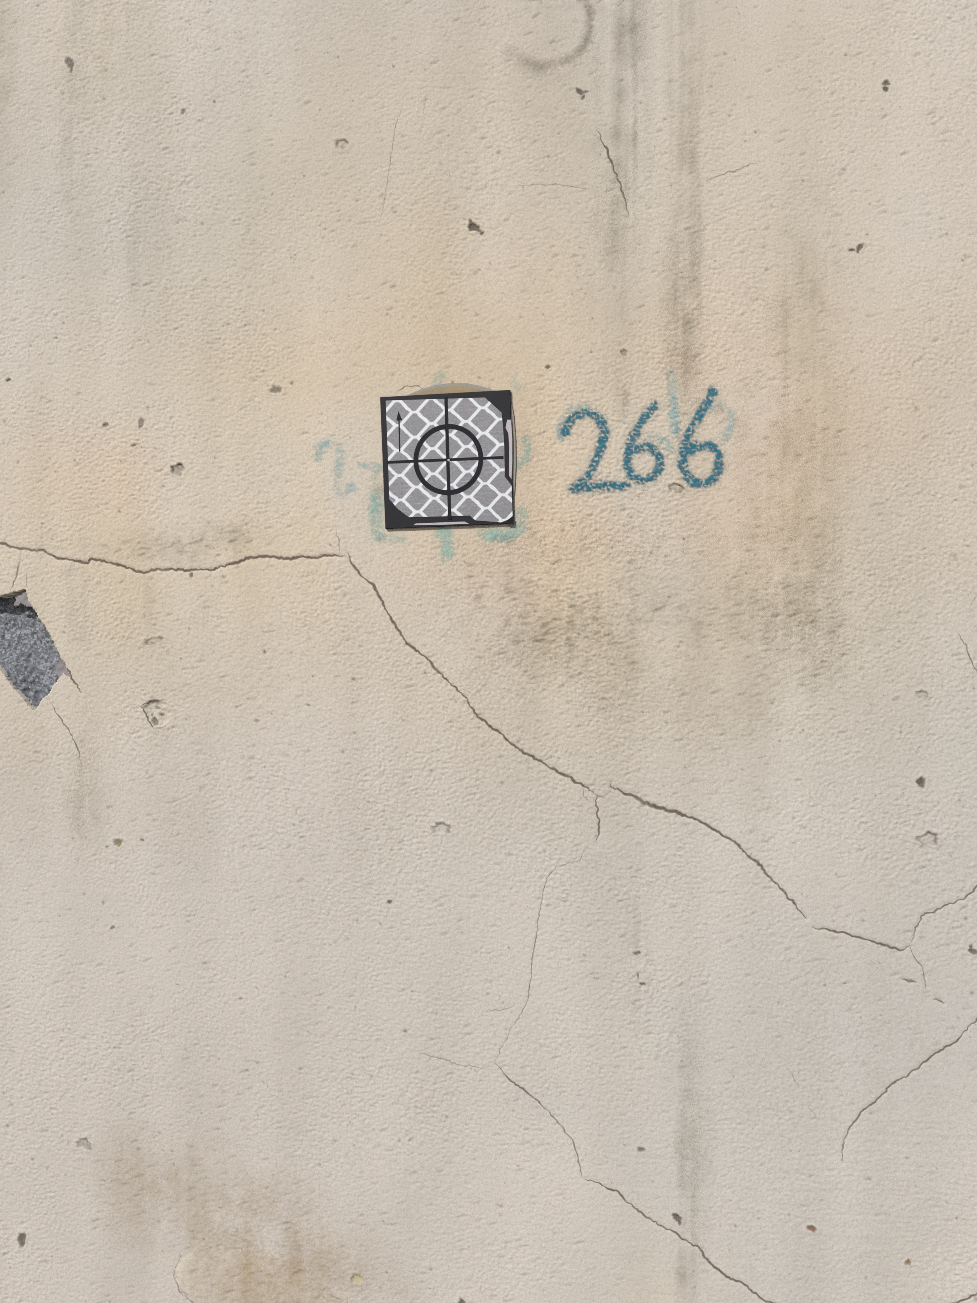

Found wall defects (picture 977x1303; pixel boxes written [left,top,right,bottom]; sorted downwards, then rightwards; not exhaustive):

spalling [0,592,70,707]
crack [0,542,977,1002]
crack [496,1064,551,1115]
crack [842,1018,977,1158]
crack [573,1142,773,1303]